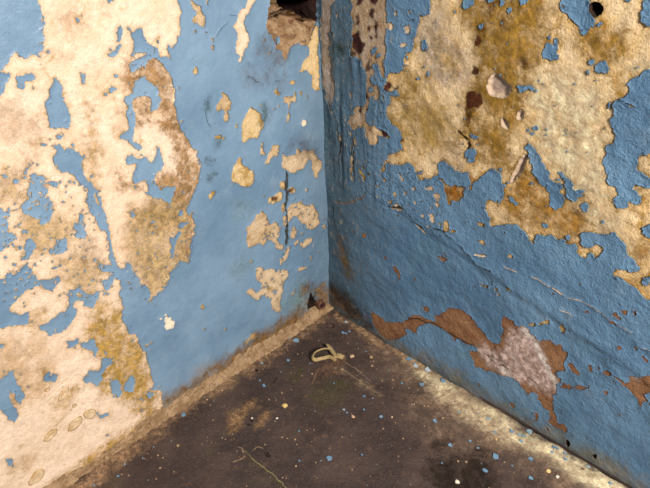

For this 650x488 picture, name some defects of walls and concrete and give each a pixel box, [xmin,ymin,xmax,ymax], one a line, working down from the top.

peeling [191,0,213,50]
peeling [0,0,202,488]
peeling [231,157,255,187]
peeling [235,104,330,178]
peeling [246,181,326,313]
crack [283,172,291,246]
peeling [263,0,650,300]
peeling [370,306,589,433]
efflorescence [477,327,557,395]
peeling [588,365,650,407]